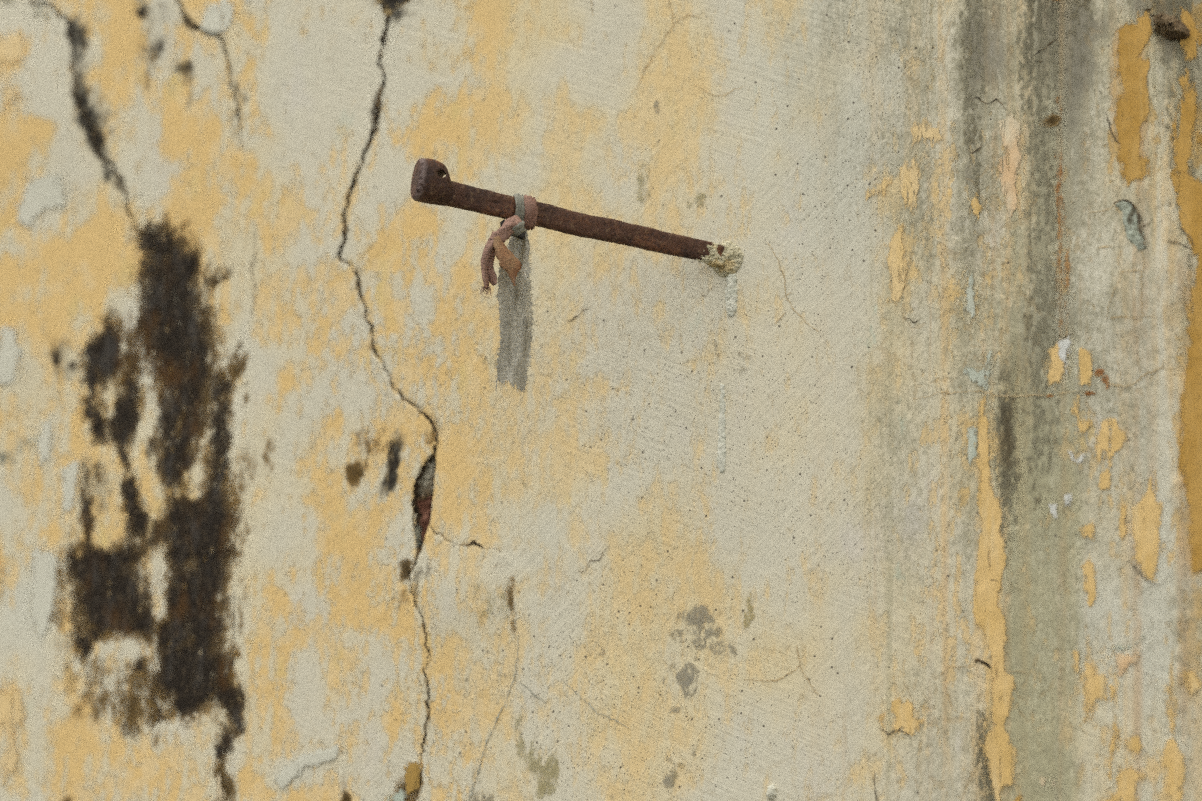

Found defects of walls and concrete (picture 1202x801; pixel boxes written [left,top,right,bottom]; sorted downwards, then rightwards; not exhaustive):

crack [2,0,143,238]
crack [135,0,243,152]
crack [336,15,439,456]
spalling [376,0,412,21]
water stain [959,0,985,215]
water stain [994,0,1092,544]
peeling [1113,11,1153,187]
peeling [1170,7,1202,574]
water stain [48,215,273,801]
spalling [411,455,436,557]
crack [395,523,501,801]
water stain [973,710,995,801]